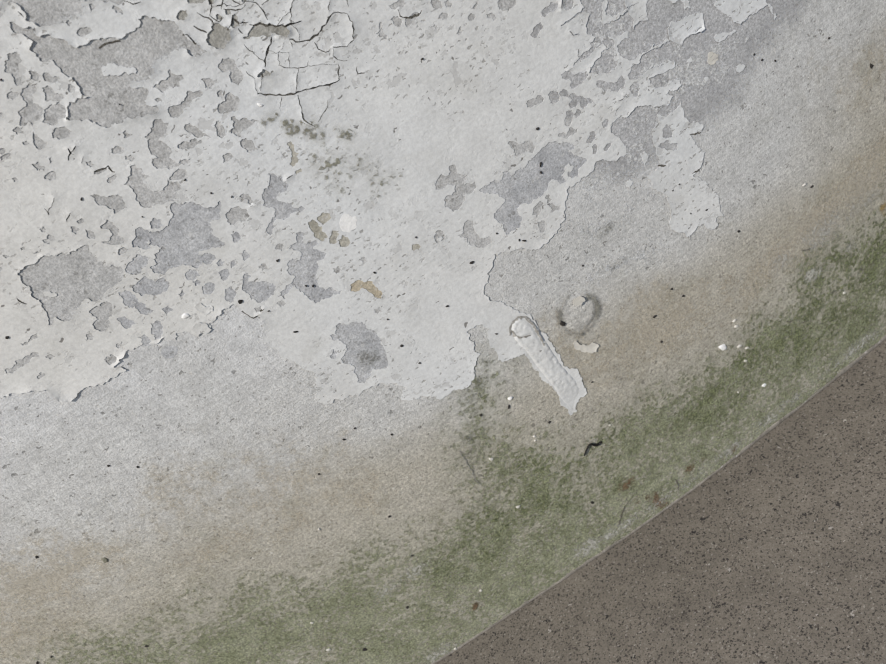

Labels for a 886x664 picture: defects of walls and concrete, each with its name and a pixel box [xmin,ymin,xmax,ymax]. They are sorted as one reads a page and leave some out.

peeling [376,0,419,39]
crack [398,10,422,19]
peeling [430,0,452,29]
crack [182,0,362,127]
peeling [435,0,801,248]
peeling [0,0,389,359]
peeling [5,334,55,373]
peeling [105,342,122,365]
peeling [330,322,388,383]
peeling [573,341,599,353]